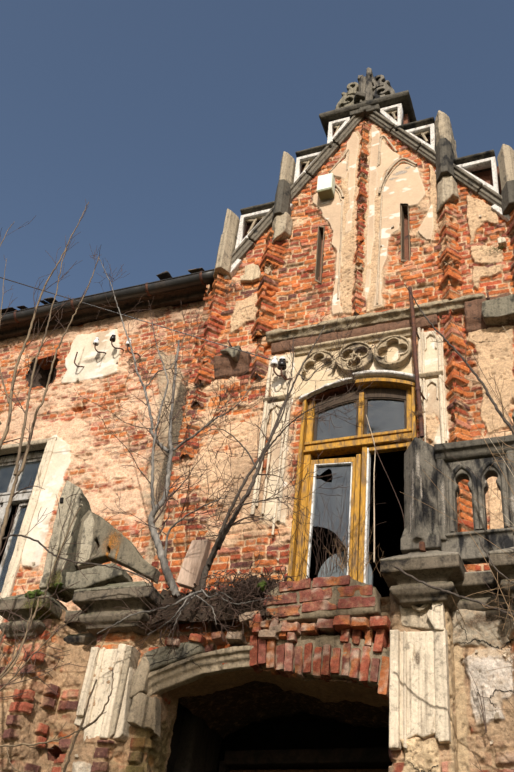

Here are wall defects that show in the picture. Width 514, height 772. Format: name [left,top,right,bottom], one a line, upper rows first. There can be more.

spalling [380,140,439,310]
spalling [476,215,507,248]
spalling [21,433,150,570]
damp [410,455,445,534]
spalling [48,746,64,761]